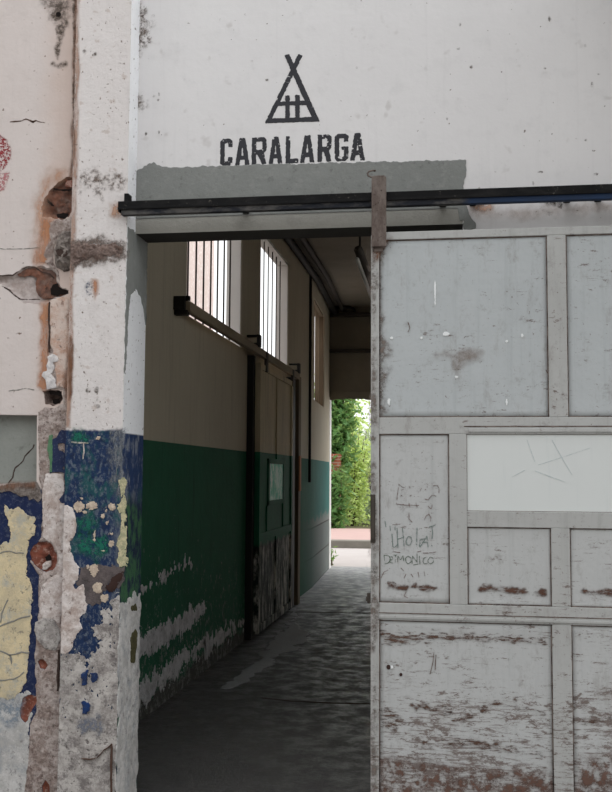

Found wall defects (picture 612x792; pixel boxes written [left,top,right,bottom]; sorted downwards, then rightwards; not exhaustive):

crack [8,444,35,483]
peeling [0,177,244,792]